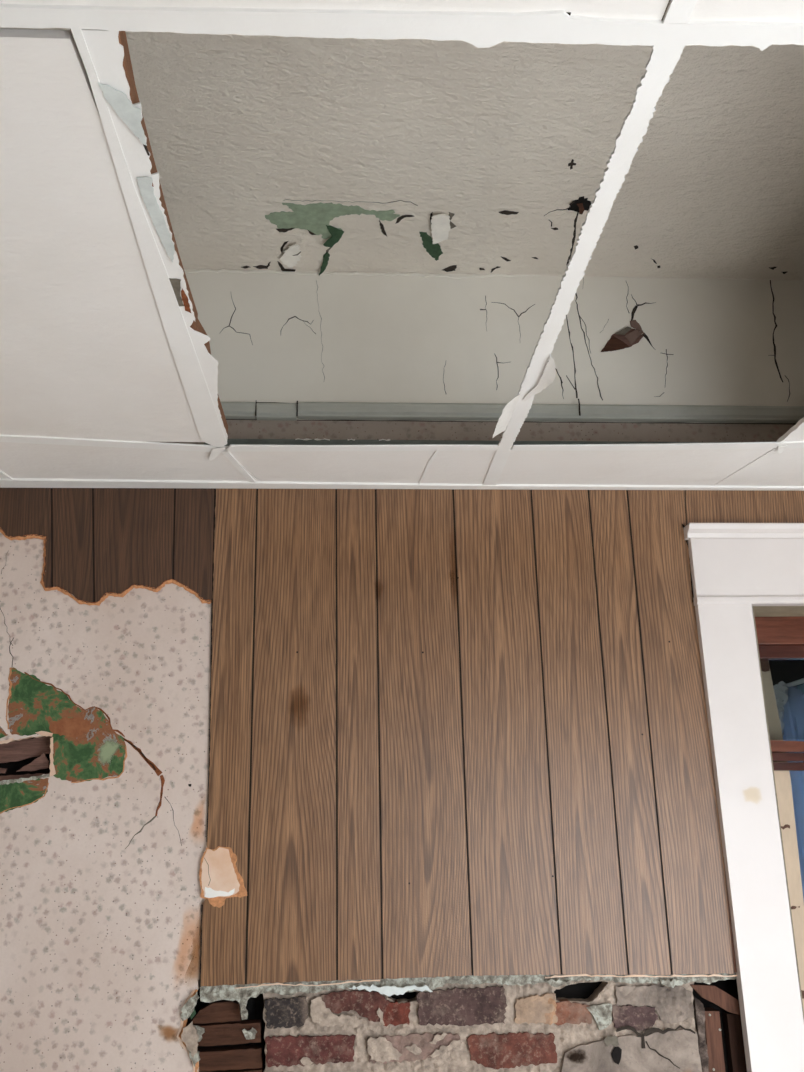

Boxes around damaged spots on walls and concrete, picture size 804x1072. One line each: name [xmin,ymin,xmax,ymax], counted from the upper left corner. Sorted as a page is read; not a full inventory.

peeling [241,202,414,276]
peeling [419,212,457,272]
crack [281,281,325,380]
crack [480,296,535,337]
crack [555,212,609,400]
spalling [601,282,656,352]
crack [770,280,790,402]
spalling [0,667,127,814]
crack [123,738,182,849]
crack [645,1041,680,1069]